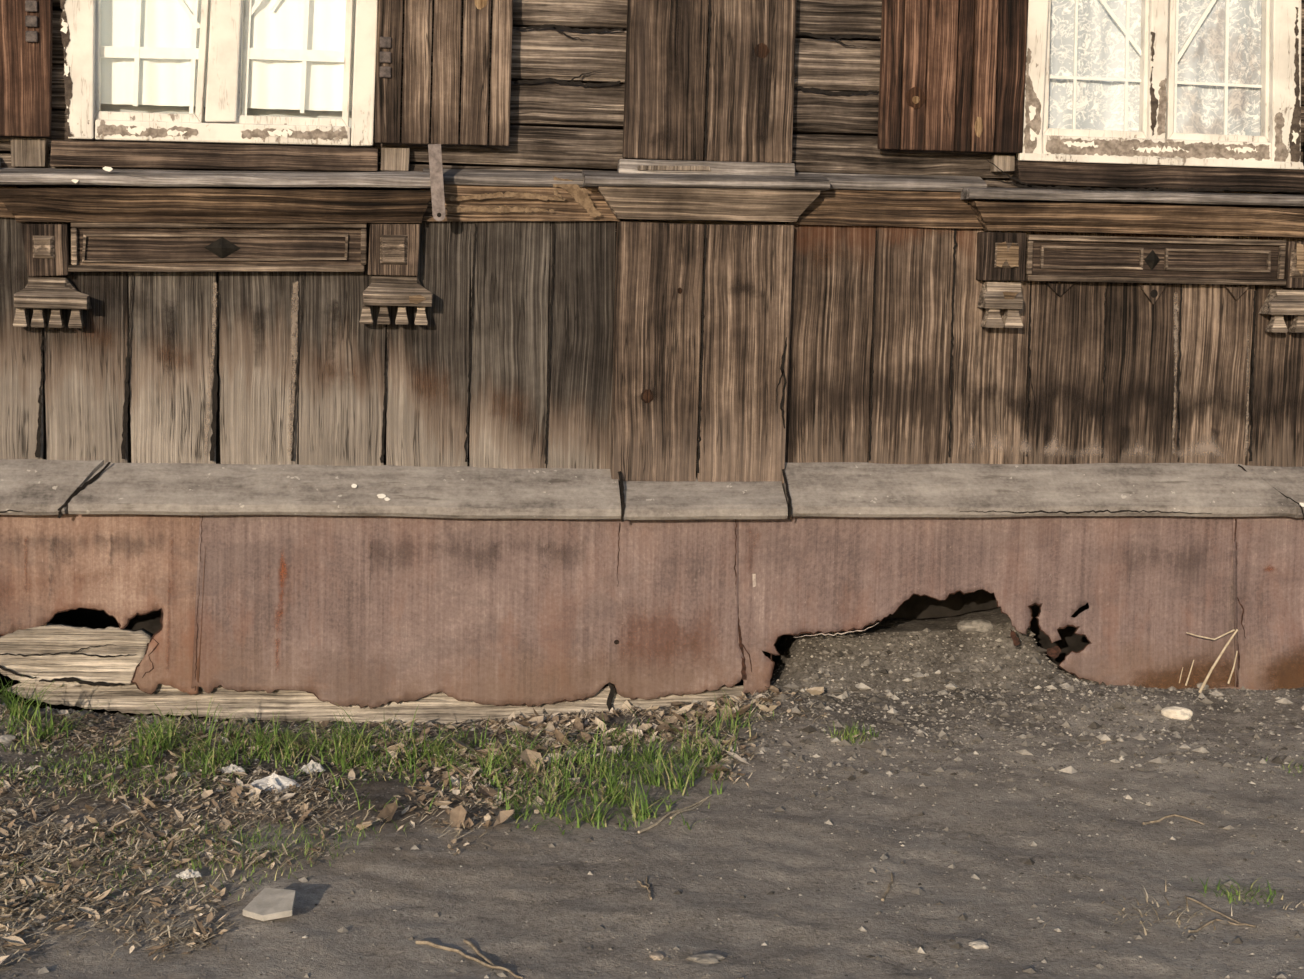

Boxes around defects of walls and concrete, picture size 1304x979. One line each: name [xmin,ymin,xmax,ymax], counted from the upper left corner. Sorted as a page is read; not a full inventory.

peeling [1024,7,1301,162]
crack [35,327,45,457]
crack [57,272,133,518]
crack [1238,290,1304,520]
crack [734,519,752,680]